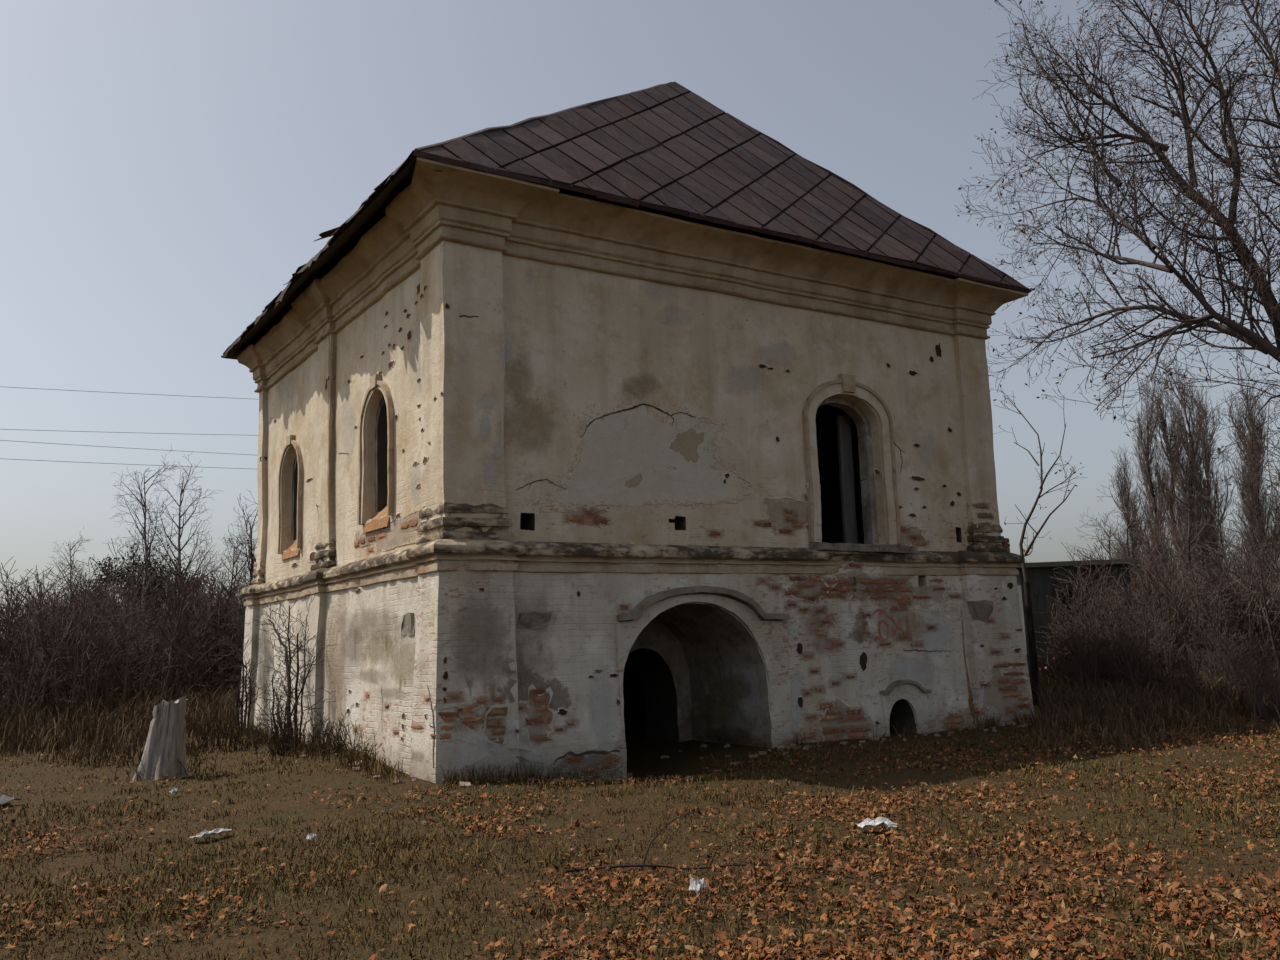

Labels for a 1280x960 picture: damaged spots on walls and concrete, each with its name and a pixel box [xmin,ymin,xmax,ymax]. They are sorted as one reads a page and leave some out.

spalling [402,391,444,467]
crack [581,403,696,437]
peeling [522,397,809,534]
flaking render [354,505,433,552]
flaking render [385,655,576,757]
flaking render [759,563,961,745]
flaking render [944,629,1030,730]